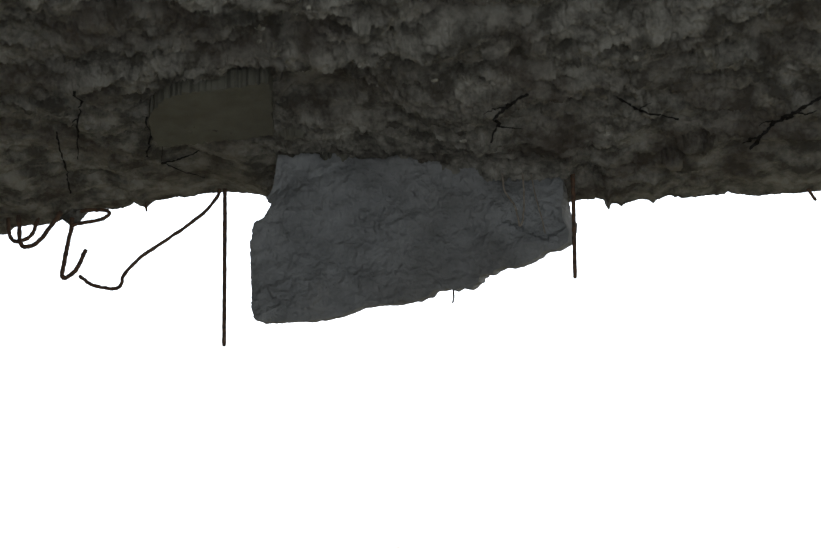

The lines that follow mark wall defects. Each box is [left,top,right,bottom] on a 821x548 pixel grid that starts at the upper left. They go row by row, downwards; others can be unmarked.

spalling [0,0,821,347]